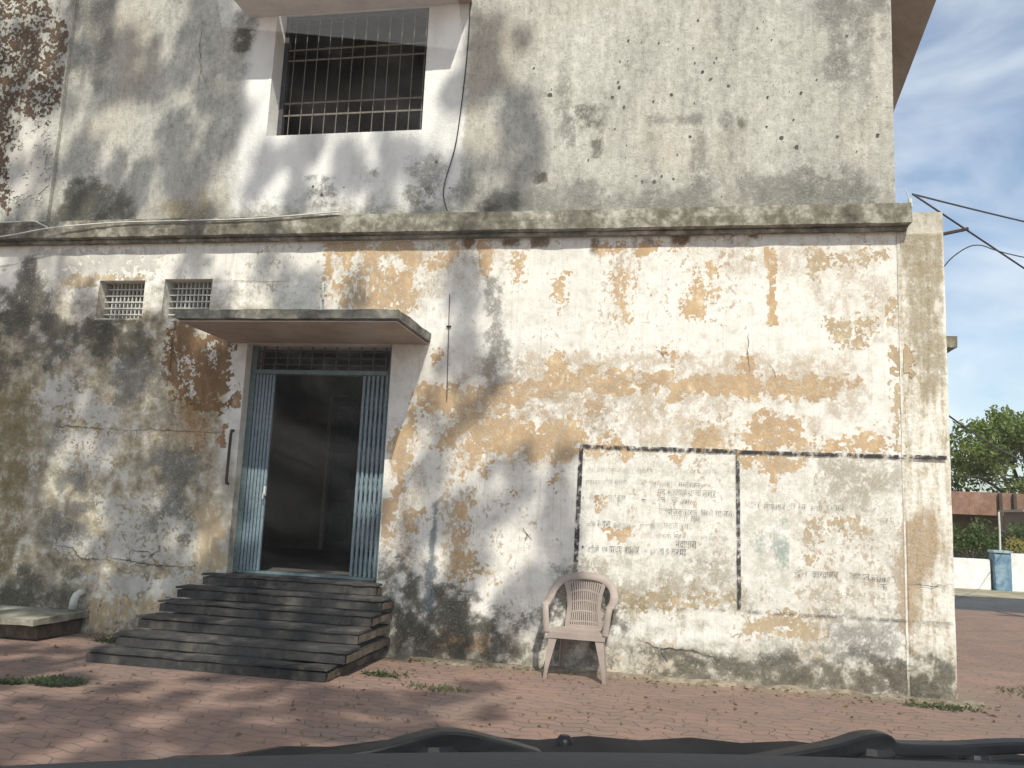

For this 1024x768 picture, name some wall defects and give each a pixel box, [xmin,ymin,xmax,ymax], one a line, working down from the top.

peeling [5,106,54,204]
water stain [55,178,136,221]
water stain [478,172,606,212]
peeling [321,240,494,315]
water stain [0,256,164,610]
peeling [0,370,227,640]
crack [61,546,189,574]
crack [55,425,218,439]
peeling [157,320,242,451]
water stain [378,503,647,663]
peeling [380,344,917,586]
water stain [643,510,956,699]